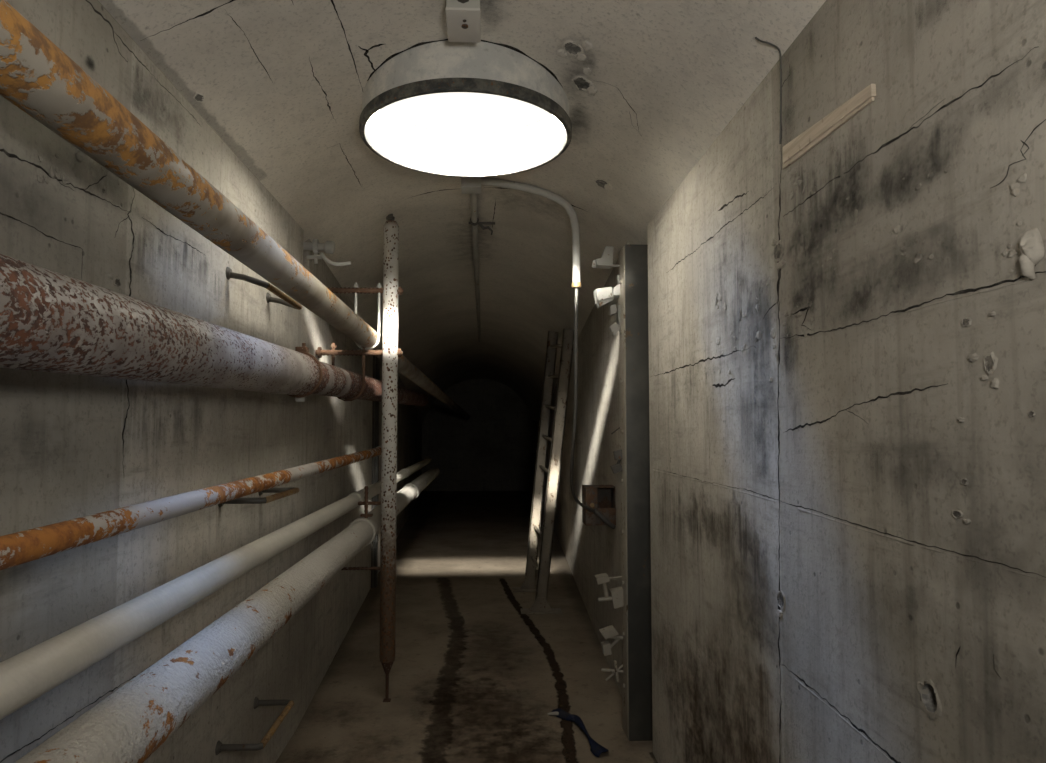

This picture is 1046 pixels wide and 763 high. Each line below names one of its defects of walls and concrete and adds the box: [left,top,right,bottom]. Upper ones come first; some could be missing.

crack [86,0,273,125]
crack [309,57,334,119]
crack [331,0,448,91]
crack [481,40,562,86]
crack [0,149,202,297]
crack [122,379,130,473]
crack [652,47,1046,763]
water stain [500,578,578,763]